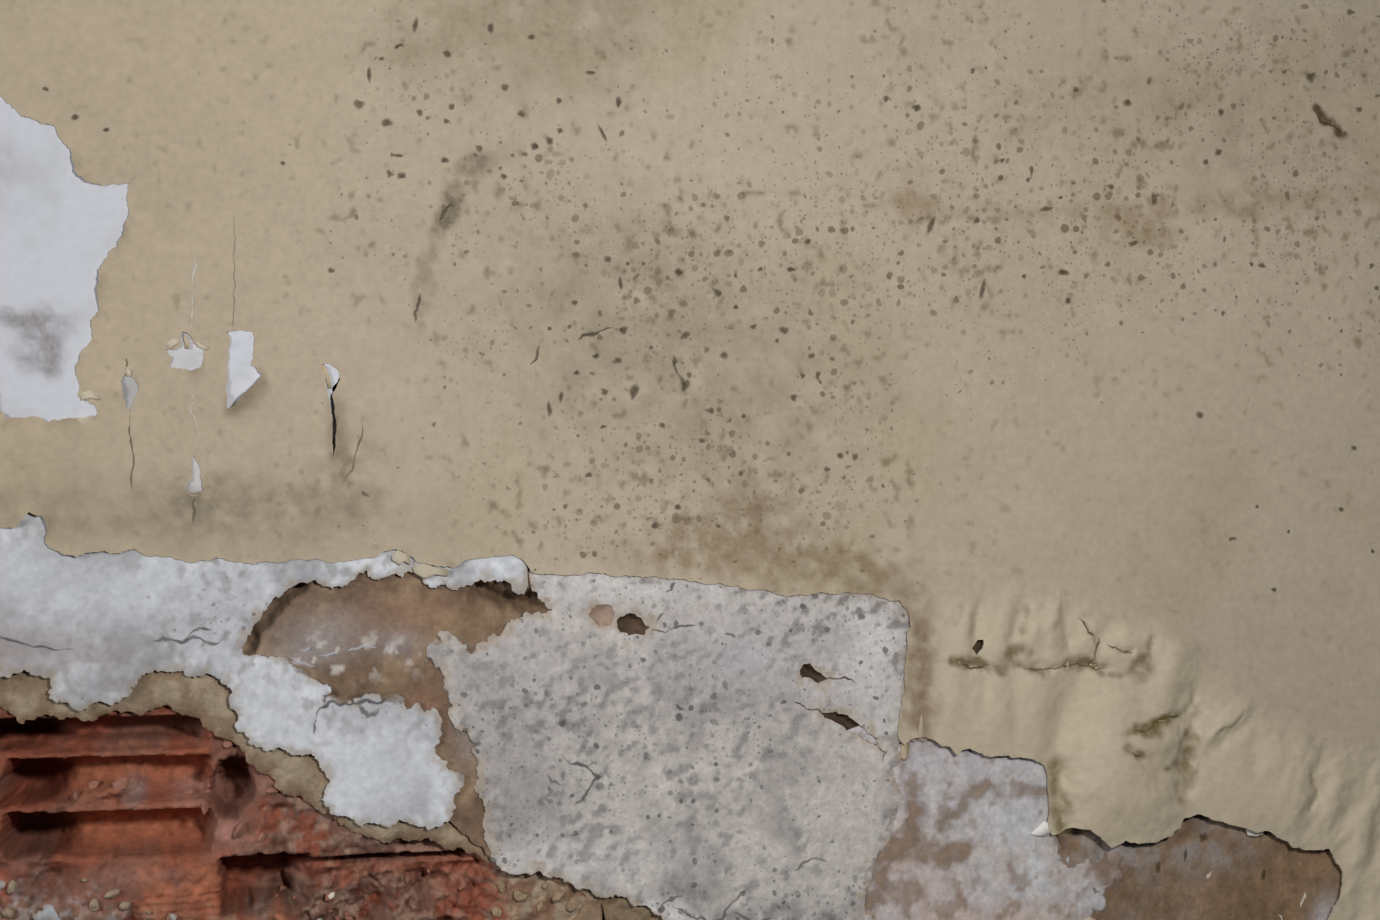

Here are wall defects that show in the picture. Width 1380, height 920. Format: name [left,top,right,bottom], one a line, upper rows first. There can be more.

peeling [0,96,129,424]
peeling [121,367,138,411]
peeling [165,332,210,371]
peeling [226,330,262,410]
peeling [321,363,339,456]
peeling [185,456,203,495]
flaking render [0,512,1342,920]